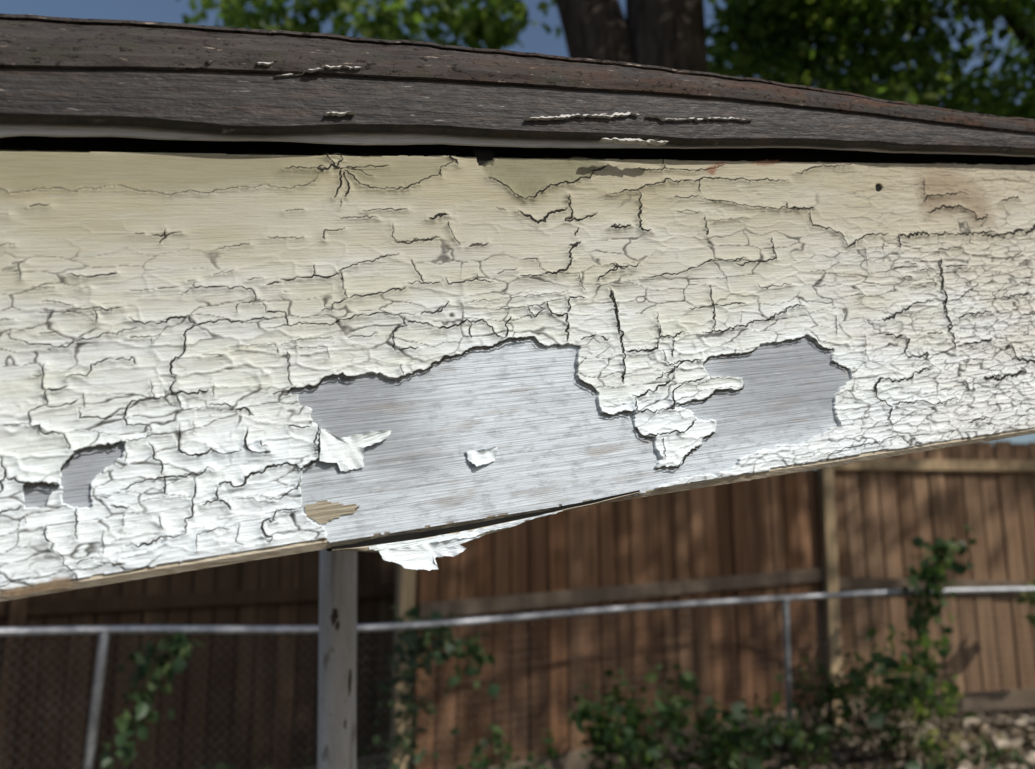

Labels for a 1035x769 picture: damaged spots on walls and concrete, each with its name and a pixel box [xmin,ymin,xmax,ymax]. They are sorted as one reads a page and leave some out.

peeling [23,442,125,508]
peeling [379,536,482,571]
crack [0,151,1035,580]
peeling [282,336,850,543]